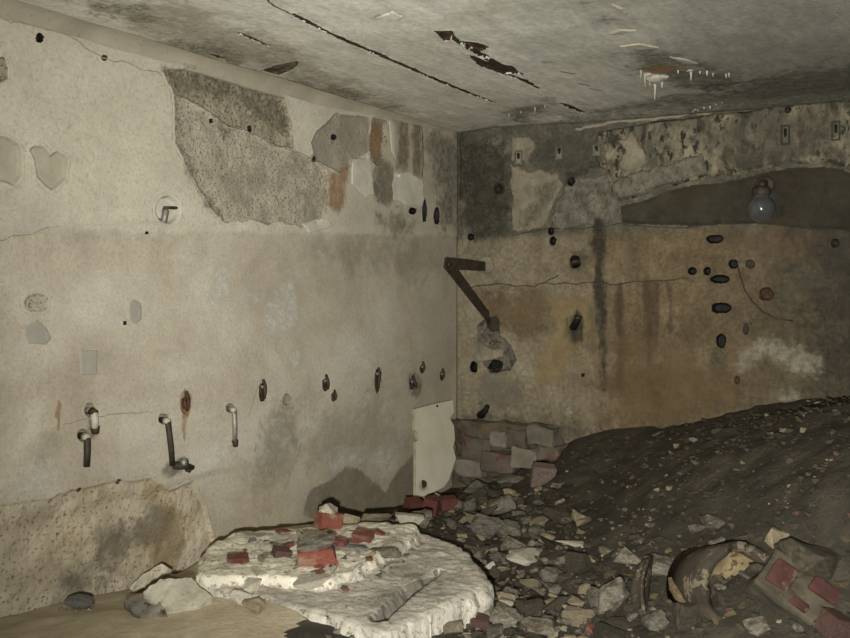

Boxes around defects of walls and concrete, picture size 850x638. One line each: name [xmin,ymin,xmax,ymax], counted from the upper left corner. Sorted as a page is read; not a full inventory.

spalling [287,11,498,103]
spalling [429,29,542,89]
spalling [162,65,396,233]
peeling [392,172,425,206]
peeling [509,100,850,233]
crack [470,275,689,288]
spalling [0,475,216,618]